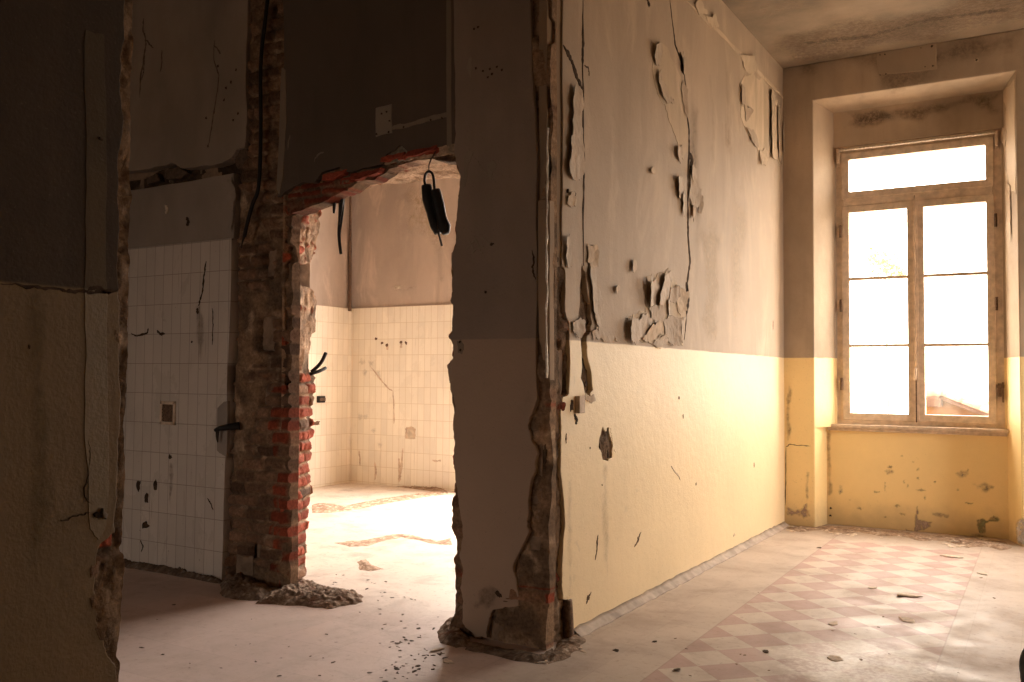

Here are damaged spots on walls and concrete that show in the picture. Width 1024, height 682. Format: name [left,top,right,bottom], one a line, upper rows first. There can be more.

crack [647,0,686,85]
peeling [652,42,704,222]
peeling [686,0,785,166]
crack [684,118,694,340]
flaking render [90,0,460,682]
spalling [492,0,690,651]
crack [61,441,91,521]
spalling [450,483,484,639]